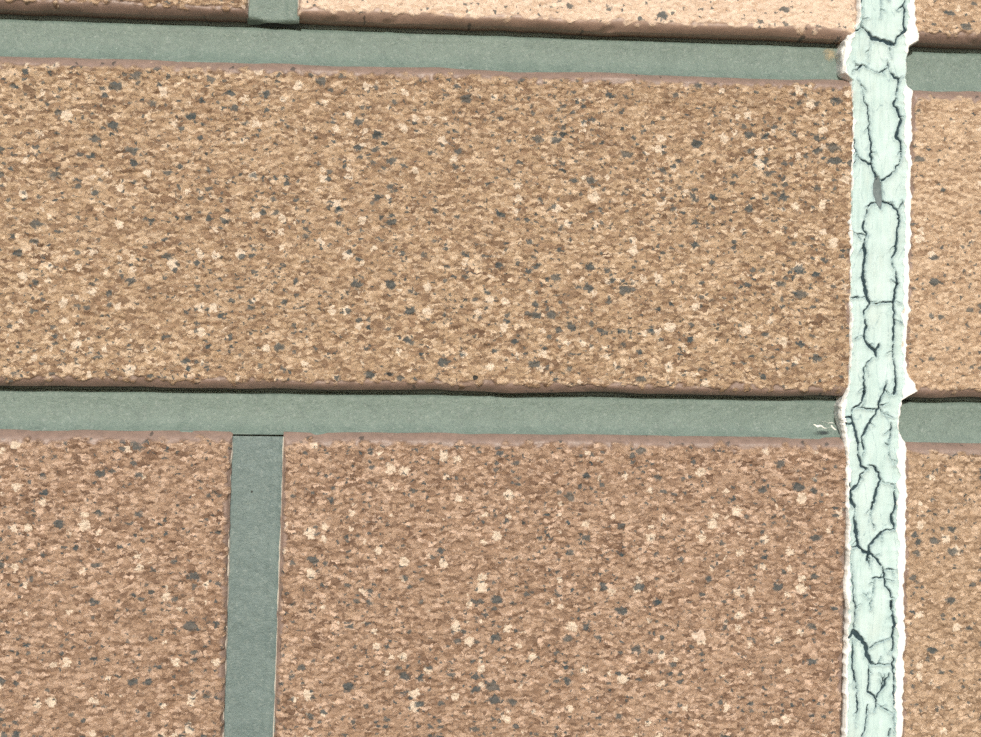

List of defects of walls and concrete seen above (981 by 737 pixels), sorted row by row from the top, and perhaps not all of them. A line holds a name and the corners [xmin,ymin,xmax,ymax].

crack [845,0,906,736]